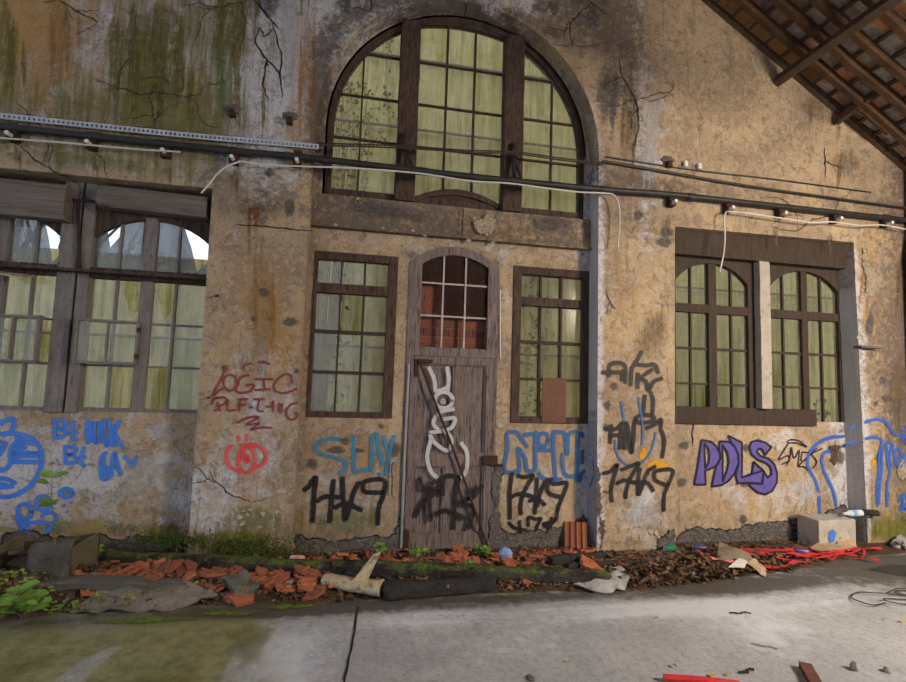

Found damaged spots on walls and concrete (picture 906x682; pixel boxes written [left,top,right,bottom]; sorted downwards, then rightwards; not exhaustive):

crack [44,0,103,35]
crack [5,55,231,215]
water stain [217,0,241,123]
crack [181,0,283,99]
crack [546,0,611,47]
crack [602,60,674,149]
crack [191,467,266,503]